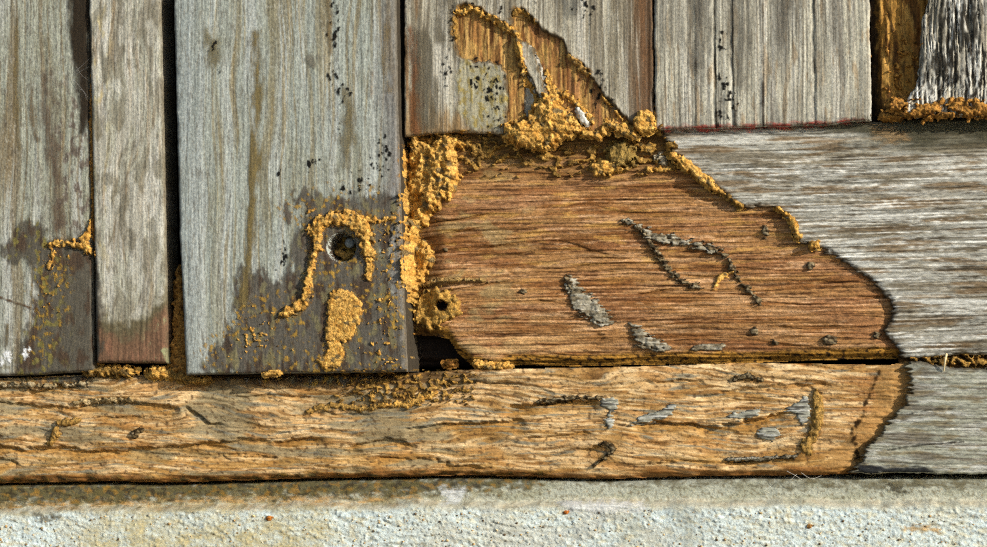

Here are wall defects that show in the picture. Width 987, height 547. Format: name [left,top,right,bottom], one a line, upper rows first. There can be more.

water stain [326,0,340,53]
water stain [206,32,221,73]
peeling [605,139,639,168]
water stain [202,61,406,388]
water stain [1,135,113,387]
peeling [621,217,763,306]
peeling [563,274,614,327]
peeling [628,322,672,354]
peeling [691,343,726,351]
peeling [822,334,838,345]
water stain [0,471,563,509]
efflorescence [557,499,646,513]